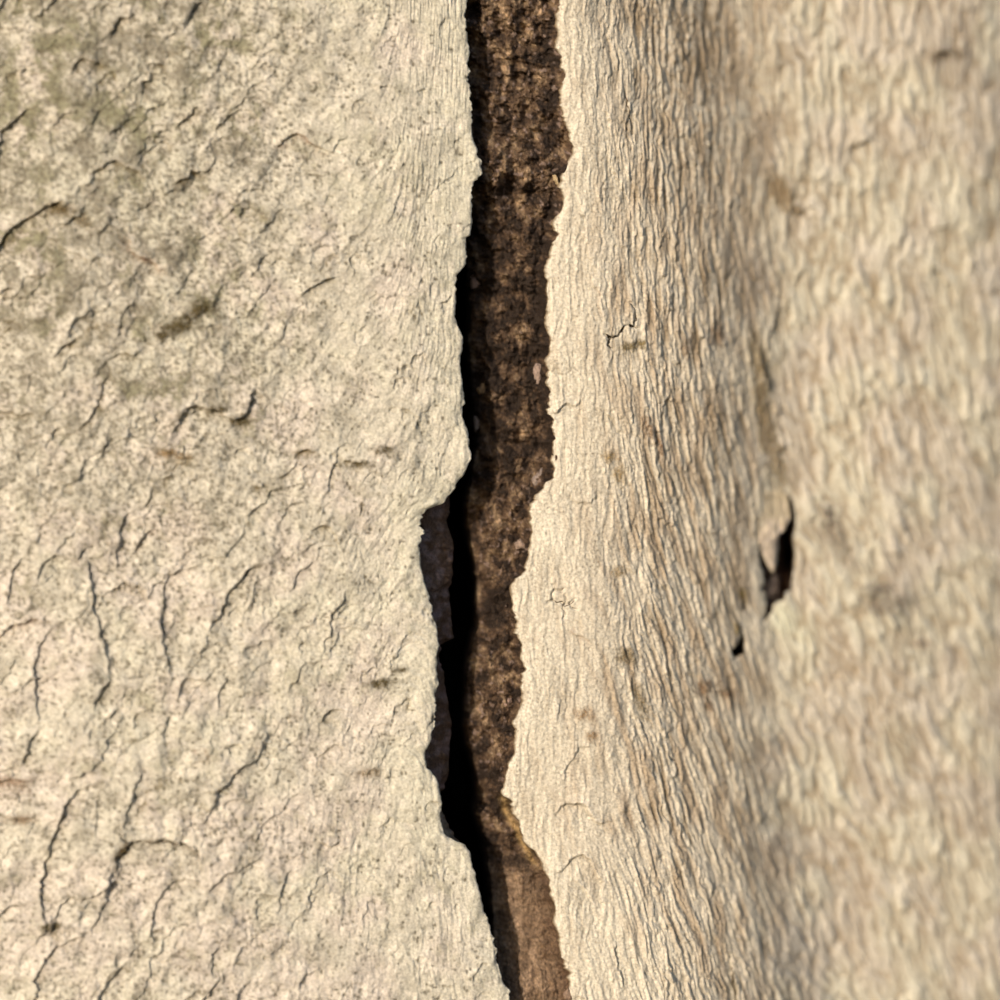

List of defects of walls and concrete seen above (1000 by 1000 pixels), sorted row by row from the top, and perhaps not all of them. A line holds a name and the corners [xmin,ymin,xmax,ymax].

crack [419,0,573,1000]
peeling [759,488,790,571]